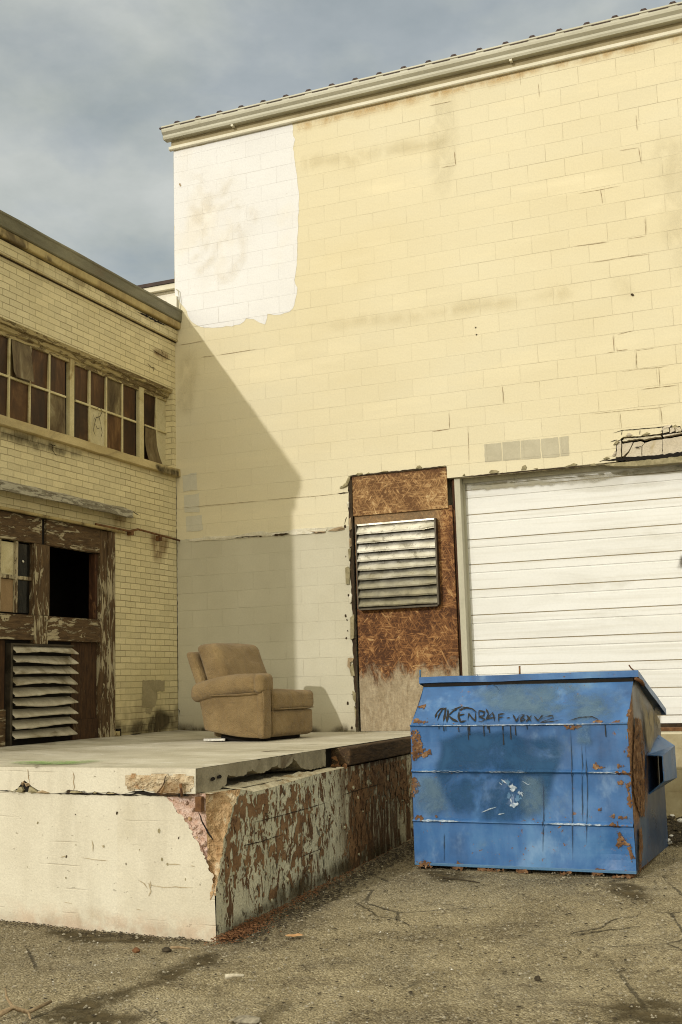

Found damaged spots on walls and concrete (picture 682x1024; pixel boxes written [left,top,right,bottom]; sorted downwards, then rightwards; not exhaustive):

spalling [455,425,682,478]
crack [595,330,674,429]
spalling [189,465,445,732]
spalling [66,759,413,913]